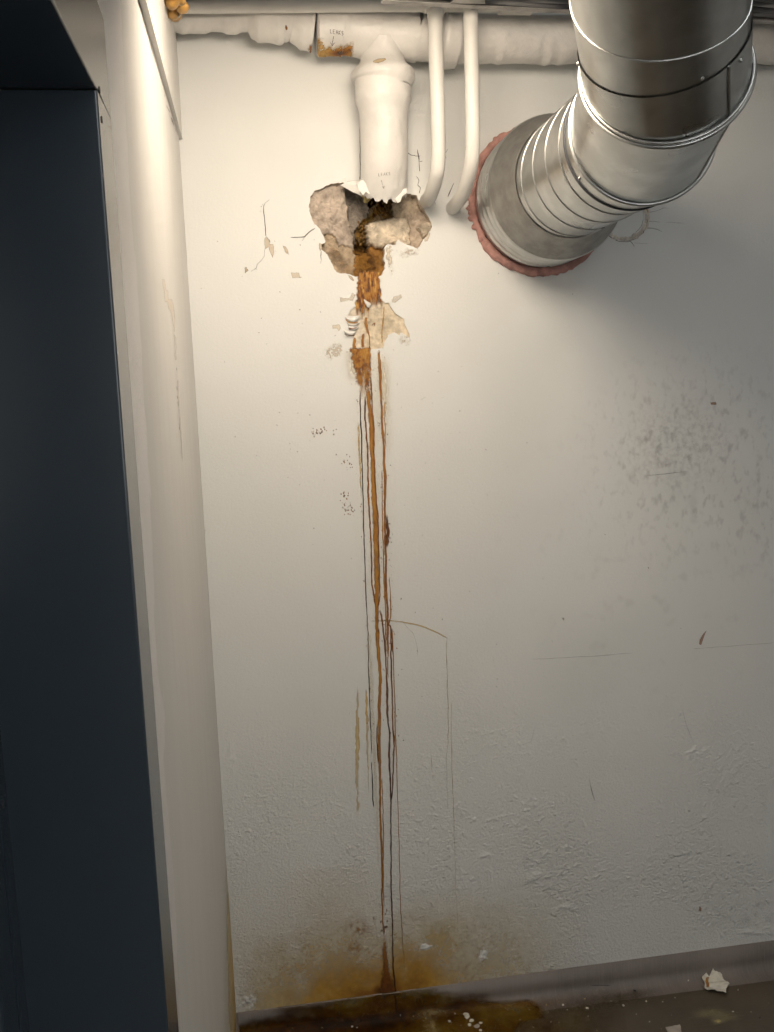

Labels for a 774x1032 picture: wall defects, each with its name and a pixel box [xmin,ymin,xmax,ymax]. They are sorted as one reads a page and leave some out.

spalling [309,177,432,281]
peeling [327,294,410,356]
corrosion [356,271,382,315]
corrosion [240,347,552,1032]
leakage [256,928,465,1010]